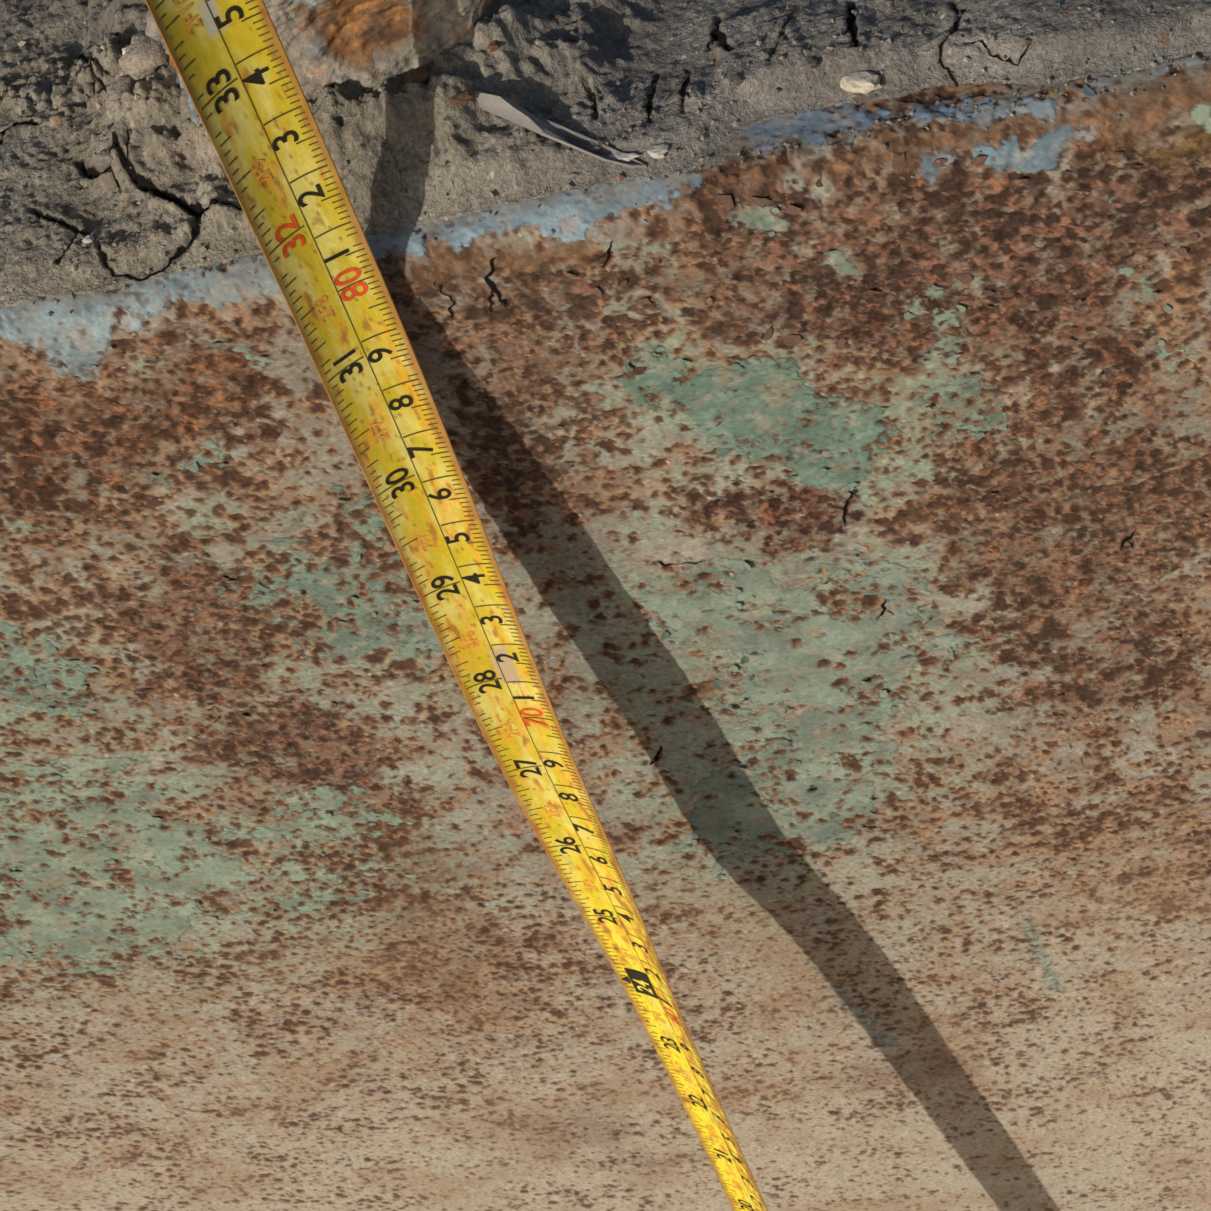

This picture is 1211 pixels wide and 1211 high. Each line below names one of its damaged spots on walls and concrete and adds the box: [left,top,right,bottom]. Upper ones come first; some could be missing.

rust [297,0,410,66]
crack [937,3,1029,87]
crack [0,120,37,144]
crack [33,129,241,282]
peeling [0,253,281,381]
crack [433,258,506,319]
rust [0,298,293,574]
peeling [617,340,901,491]
rust [377,75,1211,741]
rust [93,532,422,842]
peeling [637,550,981,882]
peeling [0,755,431,981]